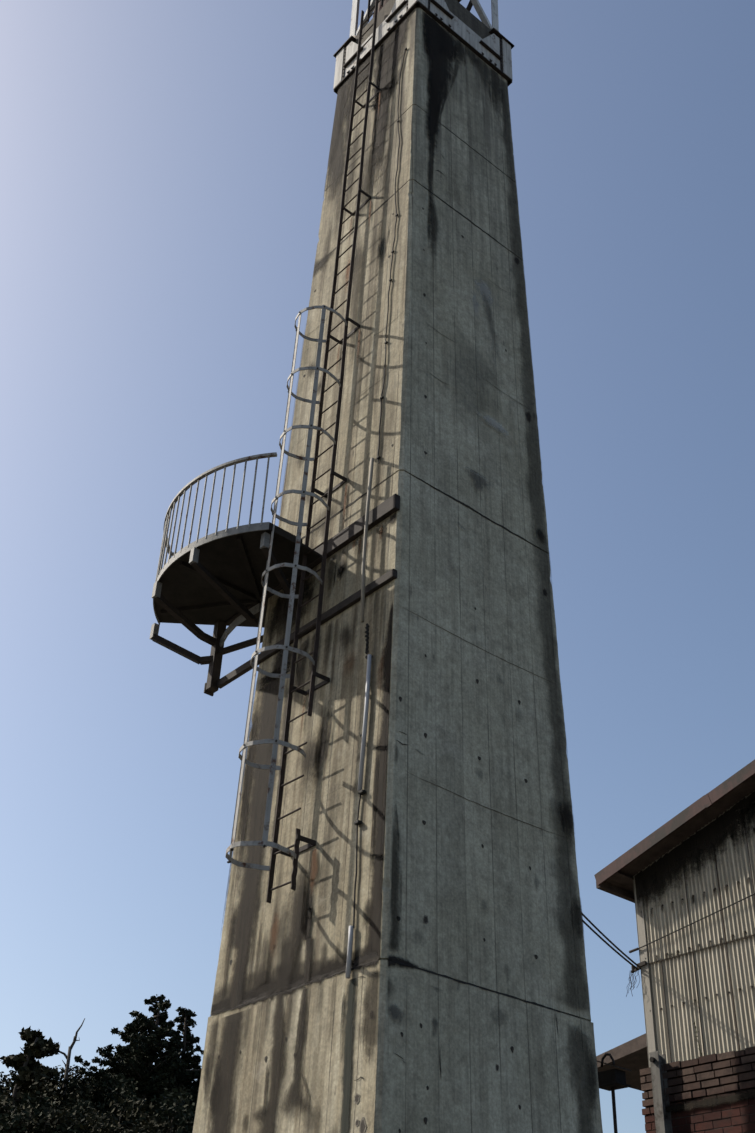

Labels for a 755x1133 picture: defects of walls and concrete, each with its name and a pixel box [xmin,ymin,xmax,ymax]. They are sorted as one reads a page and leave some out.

water stain [325,15,409,203]
water stain [423,13,476,248]
water stain [313,255,330,276]
water stain [378,230,389,258]
water stain [204,550,430,1133]
water stain [560,803,574,832]
water stain [635,791,755,905]